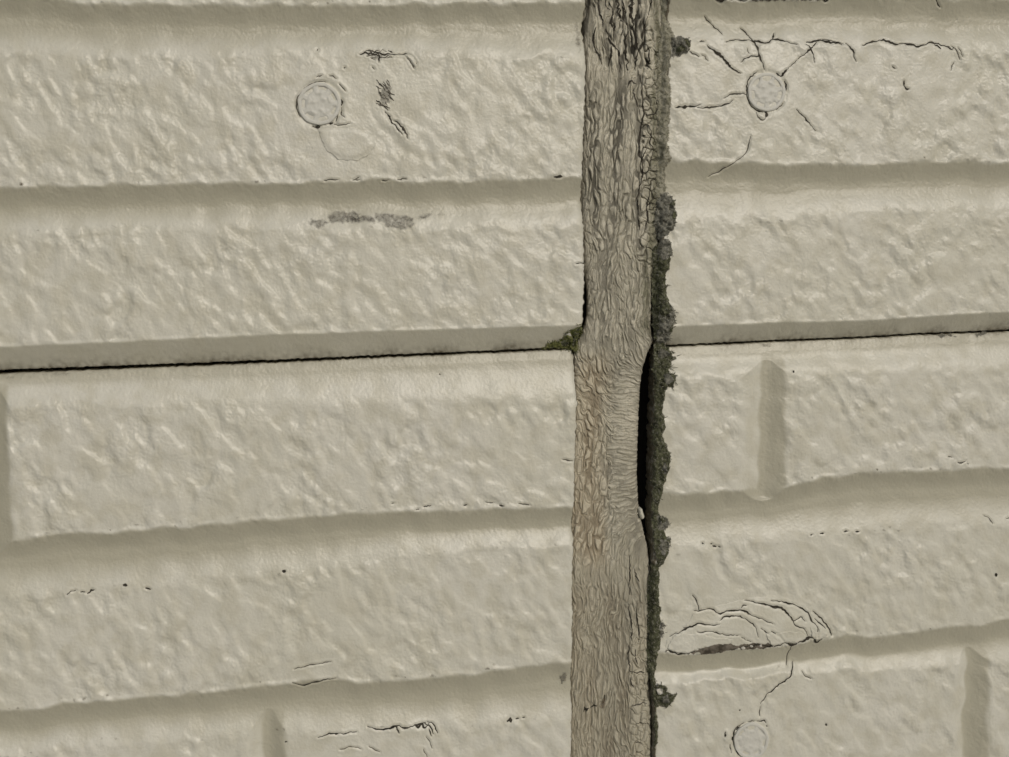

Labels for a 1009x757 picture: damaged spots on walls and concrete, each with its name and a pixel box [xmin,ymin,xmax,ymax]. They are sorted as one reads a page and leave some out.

crack [296,49,417,129]
crack [382,104,408,138]
crack [592,0,963,230]
peeling [665,595,832,655]
crack [318,721,438,755]